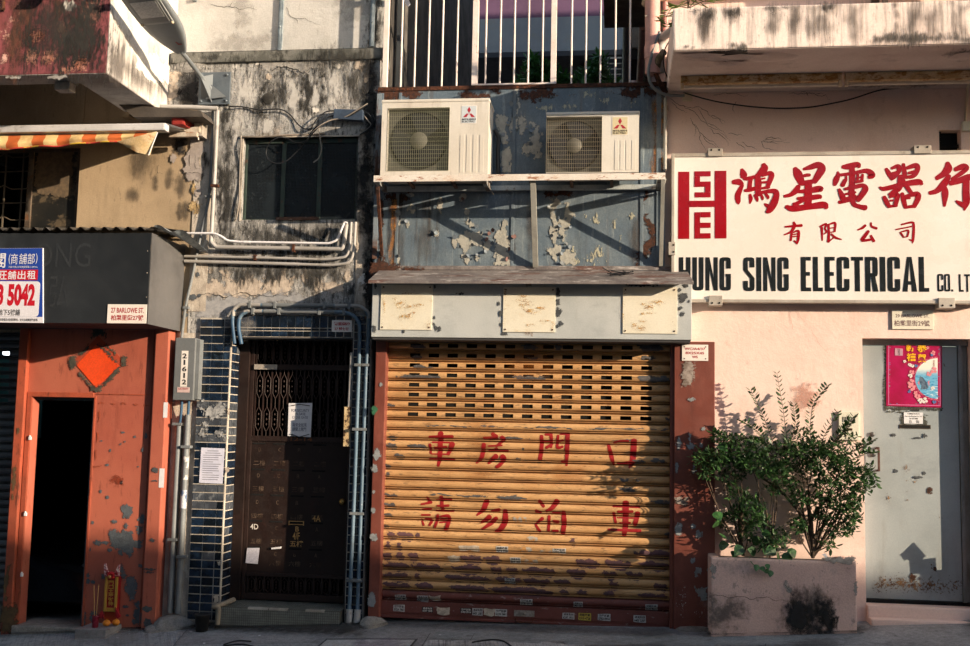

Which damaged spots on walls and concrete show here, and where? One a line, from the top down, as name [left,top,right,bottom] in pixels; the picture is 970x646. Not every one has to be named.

leakage [694,8,740,39]
leakage [874,8,969,54]
mould [177,72,199,105]
rust [375,86,423,100]
rust [458,89,501,98]
leakage [201,0,384,309]
peeling [452,191,516,266]
rust [636,190,656,266]
spalling [89,504,146,625]
peeling [370,531,669,603]
spalling [822,556,858,565]
rust [873,562,962,595]